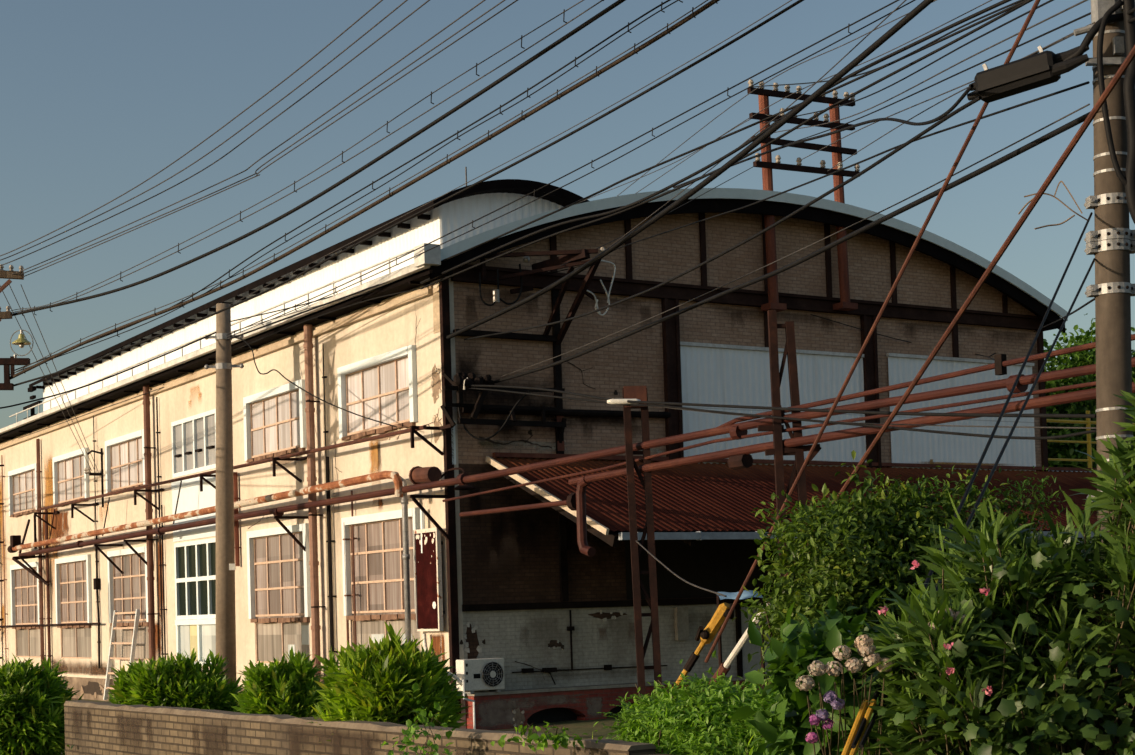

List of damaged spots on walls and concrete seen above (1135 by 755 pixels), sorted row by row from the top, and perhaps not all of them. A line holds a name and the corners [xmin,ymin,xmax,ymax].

spalling [431,364,442,443]
corrosion [42,460,69,585]
water stain [567,519,578,549]
peeling [464,622,485,659]
water stain [290,729,377,755]